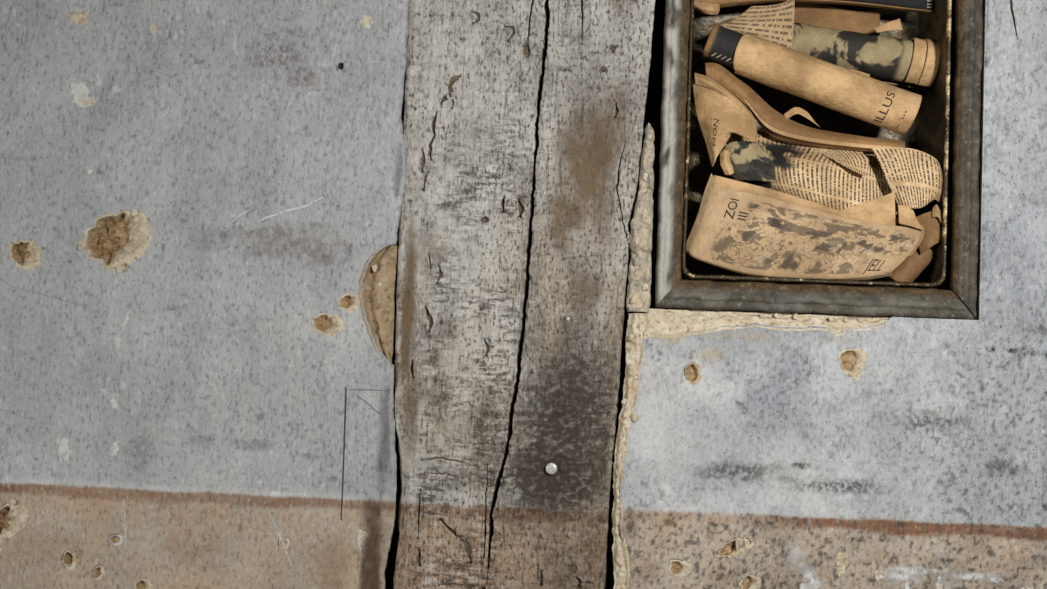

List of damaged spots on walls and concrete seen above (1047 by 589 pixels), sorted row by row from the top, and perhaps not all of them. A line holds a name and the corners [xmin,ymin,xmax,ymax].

crack [578,0,586,43]
hole [7,239,42,270]
hole [78,209,152,273]
spalling [311,244,398,364]
crack [479,0,553,589]
spalling [612,123,891,589]
hole [0,499,30,538]